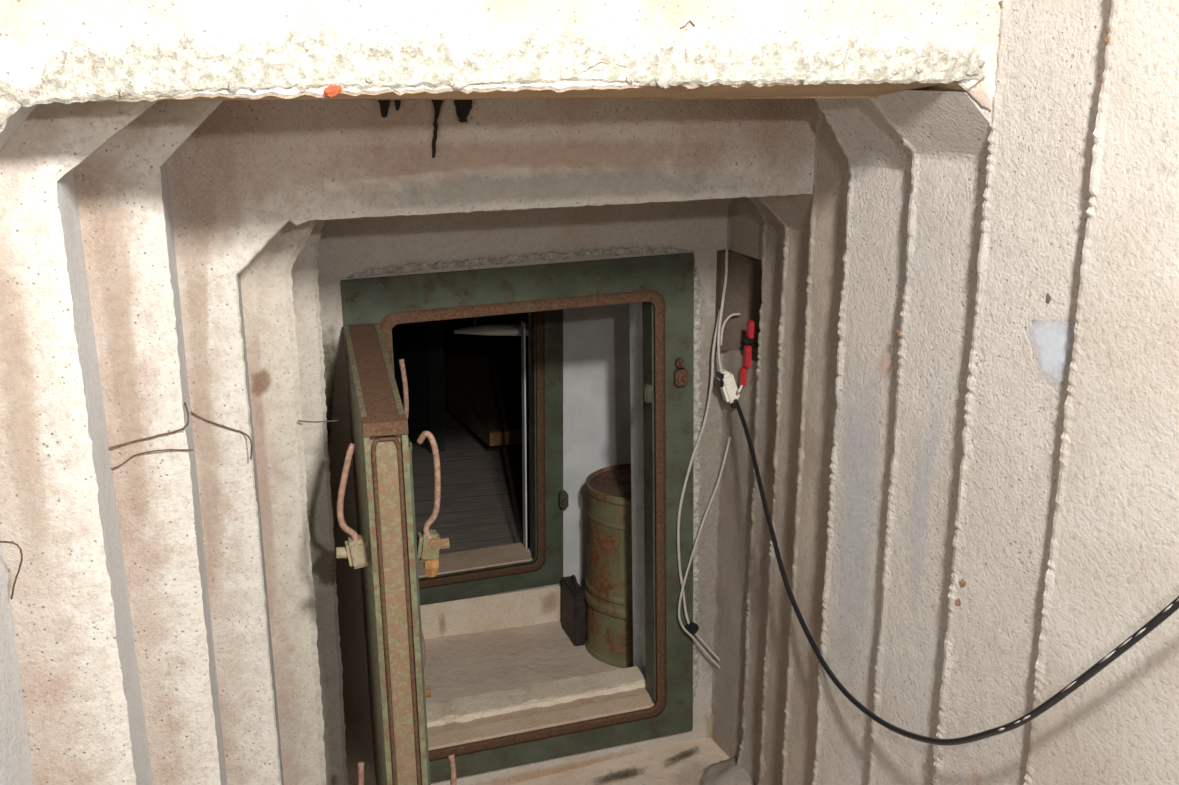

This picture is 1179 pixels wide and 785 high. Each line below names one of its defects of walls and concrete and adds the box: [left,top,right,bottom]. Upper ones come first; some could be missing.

leakage [378,100,401,118]
leakage [431,100,473,158]
rust [380,290,667,761]